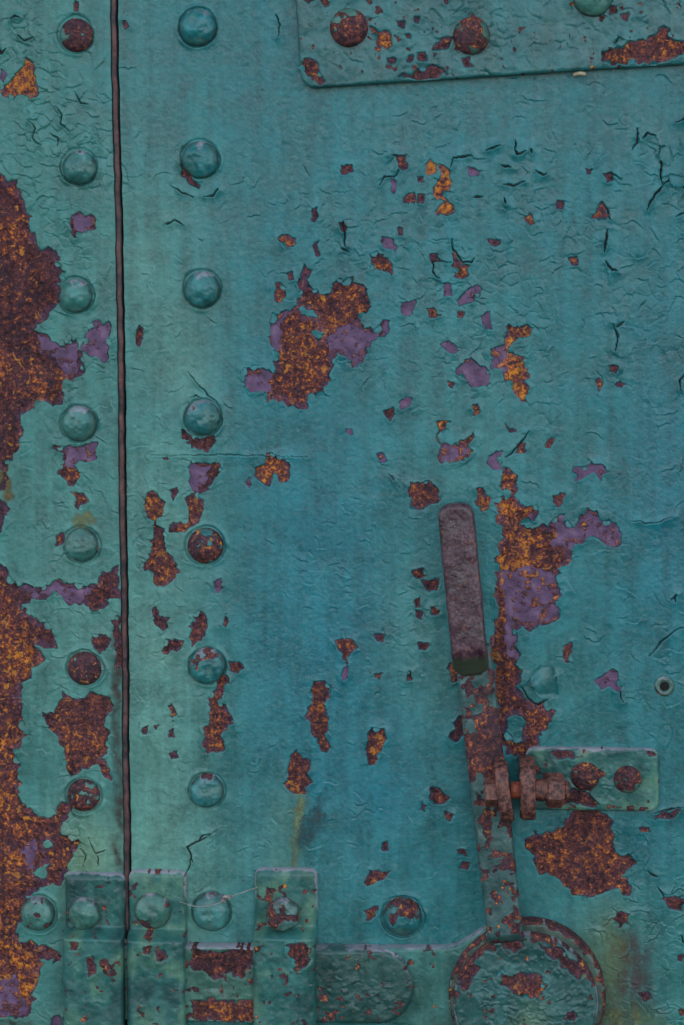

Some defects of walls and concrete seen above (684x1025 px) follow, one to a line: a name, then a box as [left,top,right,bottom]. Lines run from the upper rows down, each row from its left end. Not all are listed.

rust [601,28,684,66]
crack [632,128,684,216]
peeling [443,283,481,318]
rust [0,174,85,533]
peeling [441,323,532,402]
peeling [53,442,98,509]
peeling [171,460,222,500]
peeling [475,424,622,756]
rust [0,565,122,1025]
crack [186,834,210,873]
rust [497,970,547,999]
rust [540,945,586,980]